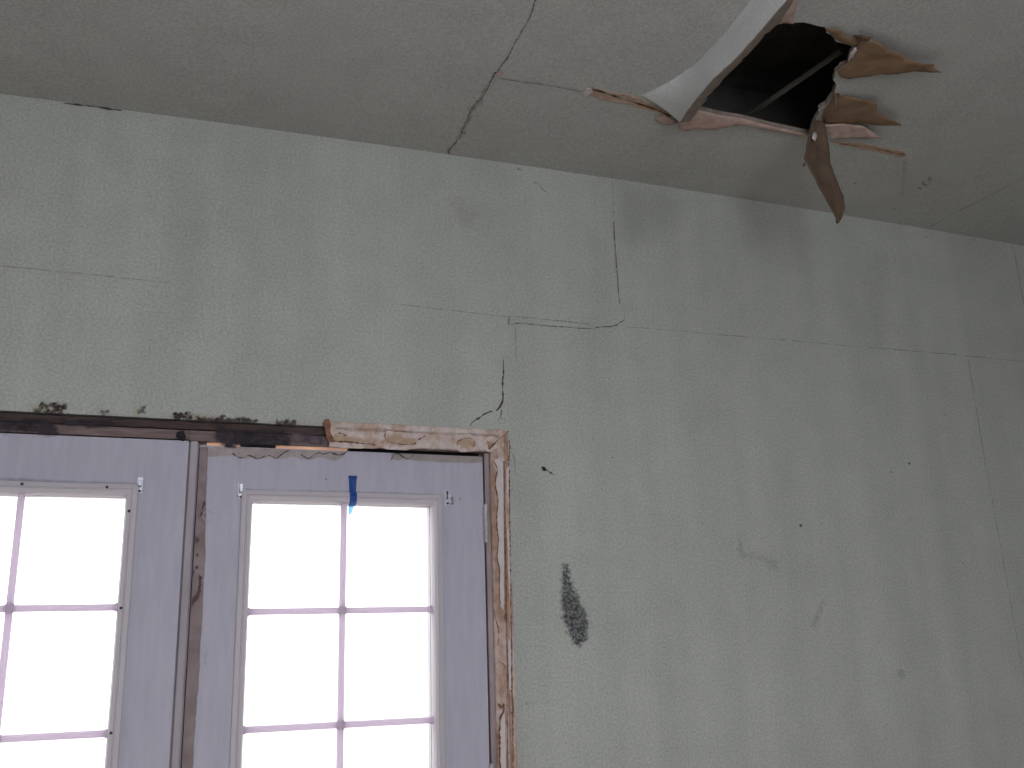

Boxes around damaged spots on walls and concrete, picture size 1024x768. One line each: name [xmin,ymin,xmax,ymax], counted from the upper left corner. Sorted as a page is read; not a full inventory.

crack [446,0,580,154]
spalling [702,22,852,130]
damp [0,417,114,435]
damp [215,427,324,448]
crack [400,178,1024,677]